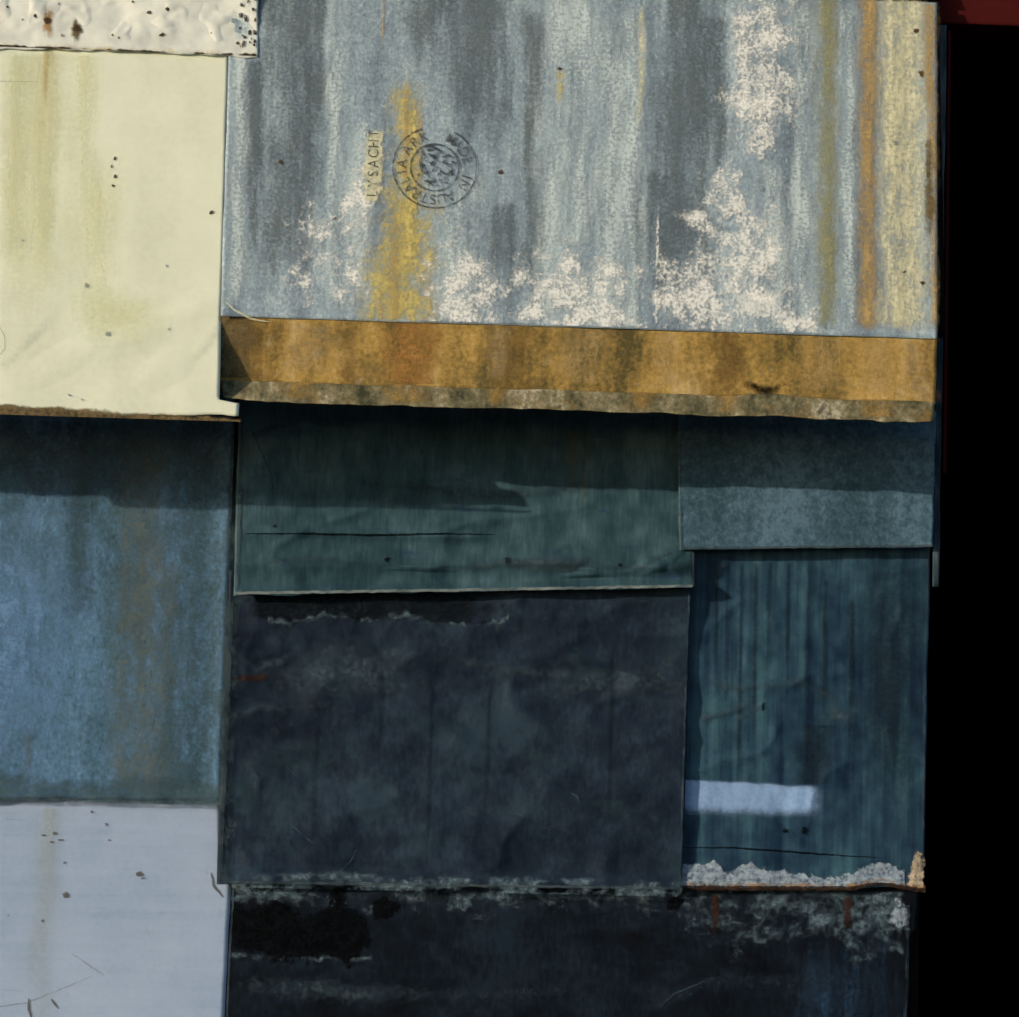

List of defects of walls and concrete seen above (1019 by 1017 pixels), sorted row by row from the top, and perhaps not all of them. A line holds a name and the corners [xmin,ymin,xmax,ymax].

corrosion [0,3,84,72]
corrosion [722,0,808,159]
damp [763,7,813,331]
damp [839,11,855,316]
corrosion [860,0,936,326]
corrosion [220,87,937,416]
corrosion [0,404,241,422]
peeling [230,874,469,969]
peeling [490,878,545,894]
peeling [563,879,590,894]